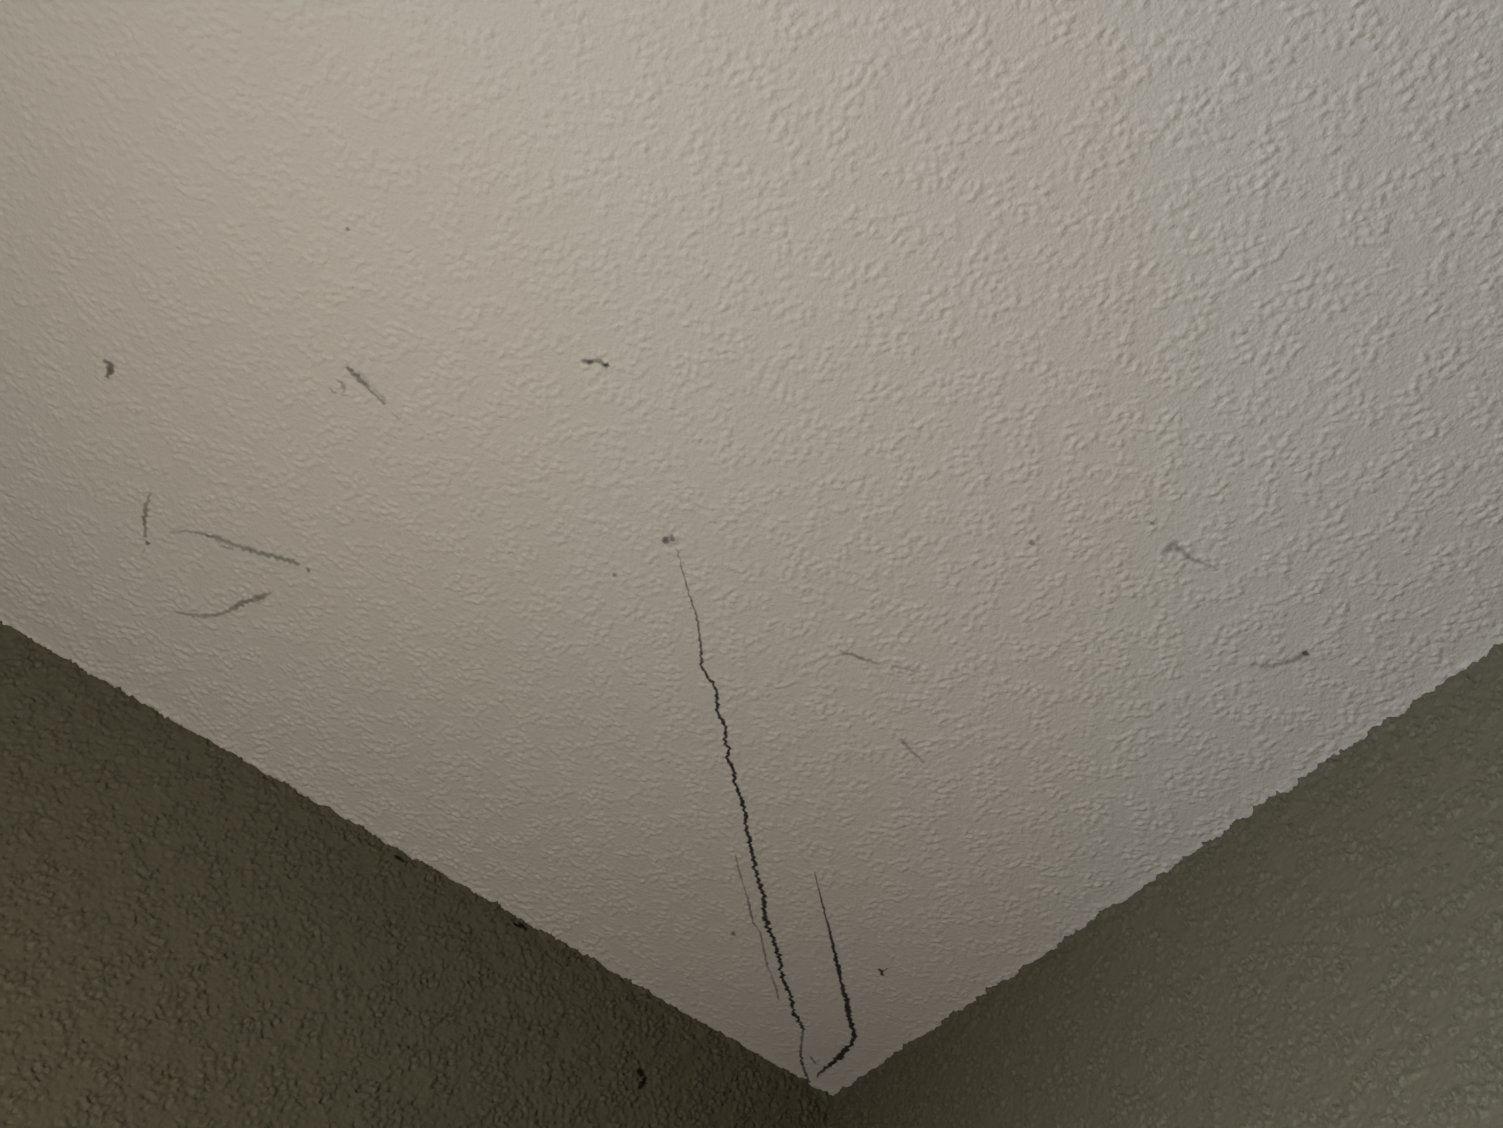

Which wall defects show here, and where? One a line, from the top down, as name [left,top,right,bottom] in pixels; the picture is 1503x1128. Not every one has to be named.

crack [696,619,857,1083]